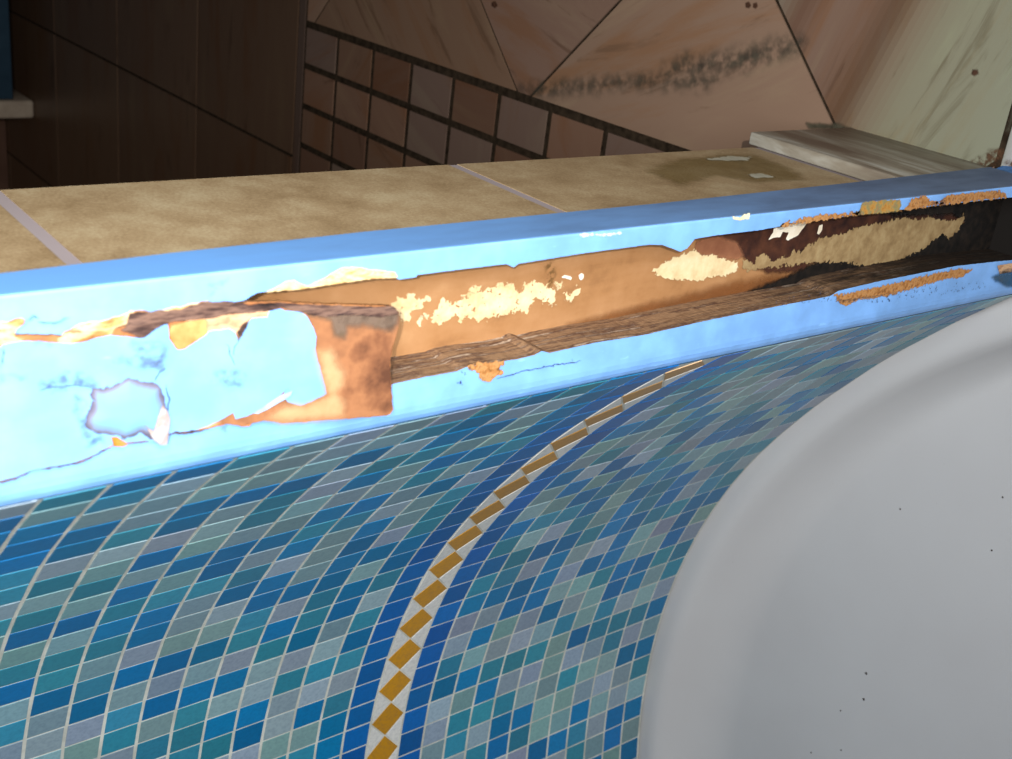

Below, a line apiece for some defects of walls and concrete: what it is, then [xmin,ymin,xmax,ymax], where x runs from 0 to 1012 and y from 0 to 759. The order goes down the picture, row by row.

peeling [782,190,1007,234]
peeling [553,273,584,302]
peeling [834,268,972,306]
peeling [169,310,270,350]
peeling [198,309,399,430]
peeling [468,360,504,382]
crack [0,368,206,483]